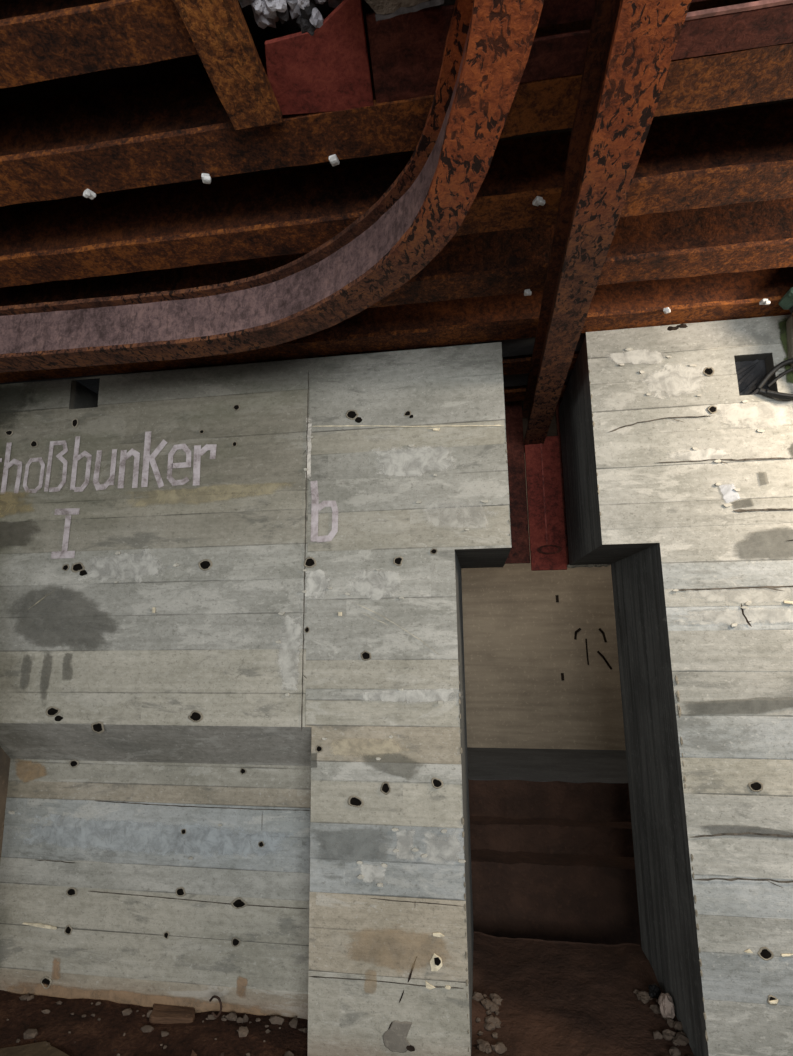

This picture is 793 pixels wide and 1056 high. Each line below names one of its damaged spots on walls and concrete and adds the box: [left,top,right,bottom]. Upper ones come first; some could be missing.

crack [733,506,793,514]
crack [690,831,793,839]
crack [695,878,793,888]